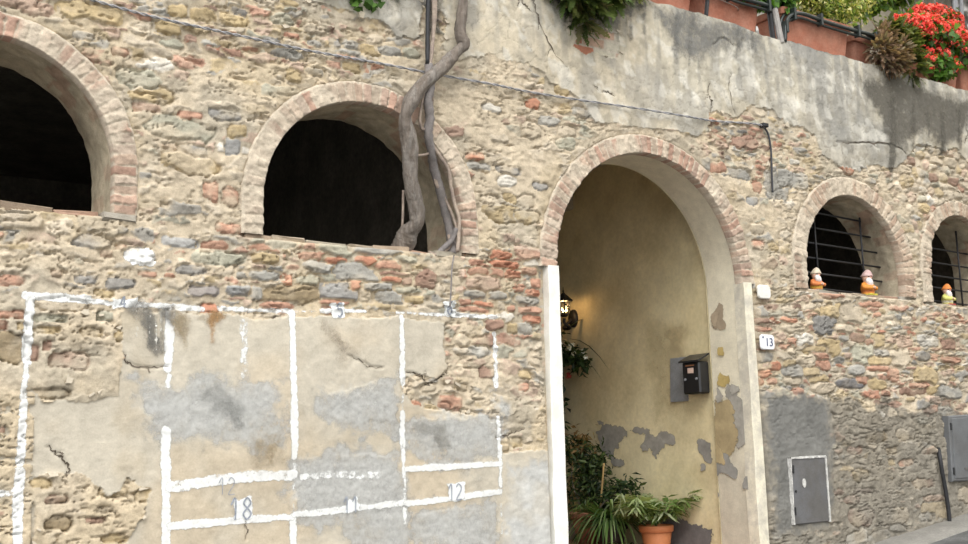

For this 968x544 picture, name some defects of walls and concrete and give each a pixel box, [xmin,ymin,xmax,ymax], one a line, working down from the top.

spalling [109,0,371,34]
spalling [418,0,450,48]
crack [518,0,567,67]
spalling [575,27,625,58]
crack [838,141,906,153]
water stain [128,302,185,354]
peeling [710,303,726,330]
peeling [596,421,676,467]
peeling [697,372,748,490]